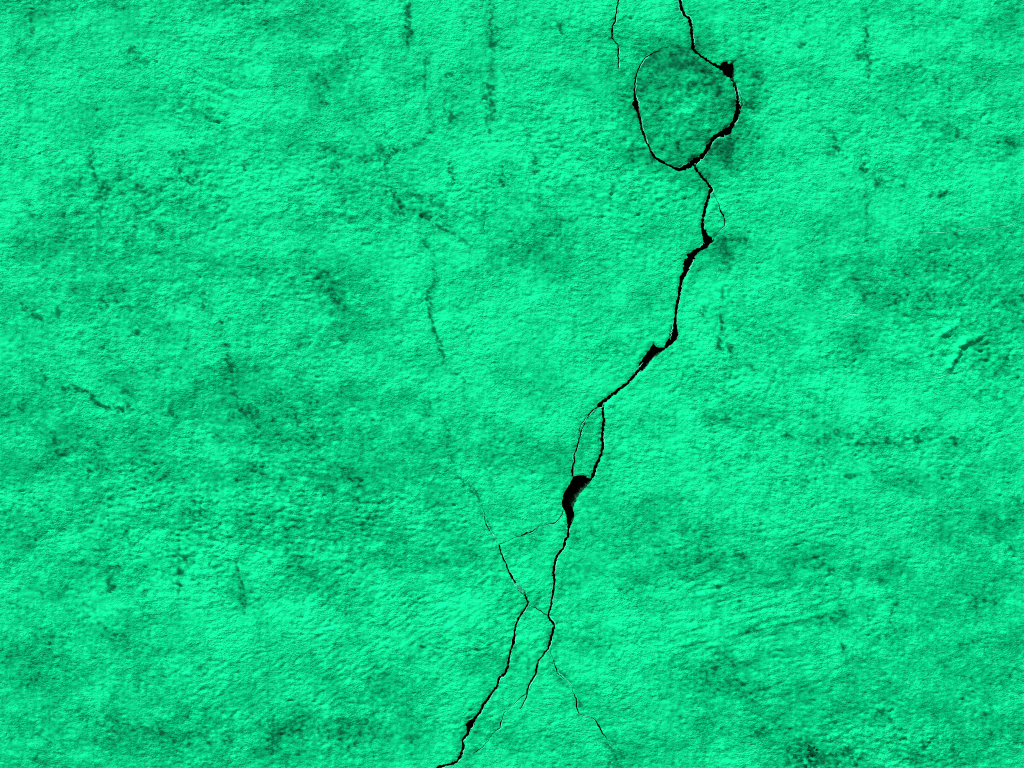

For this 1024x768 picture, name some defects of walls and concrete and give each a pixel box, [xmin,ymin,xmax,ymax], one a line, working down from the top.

crack [571,0,743,478]
crack [436,510,613,768]